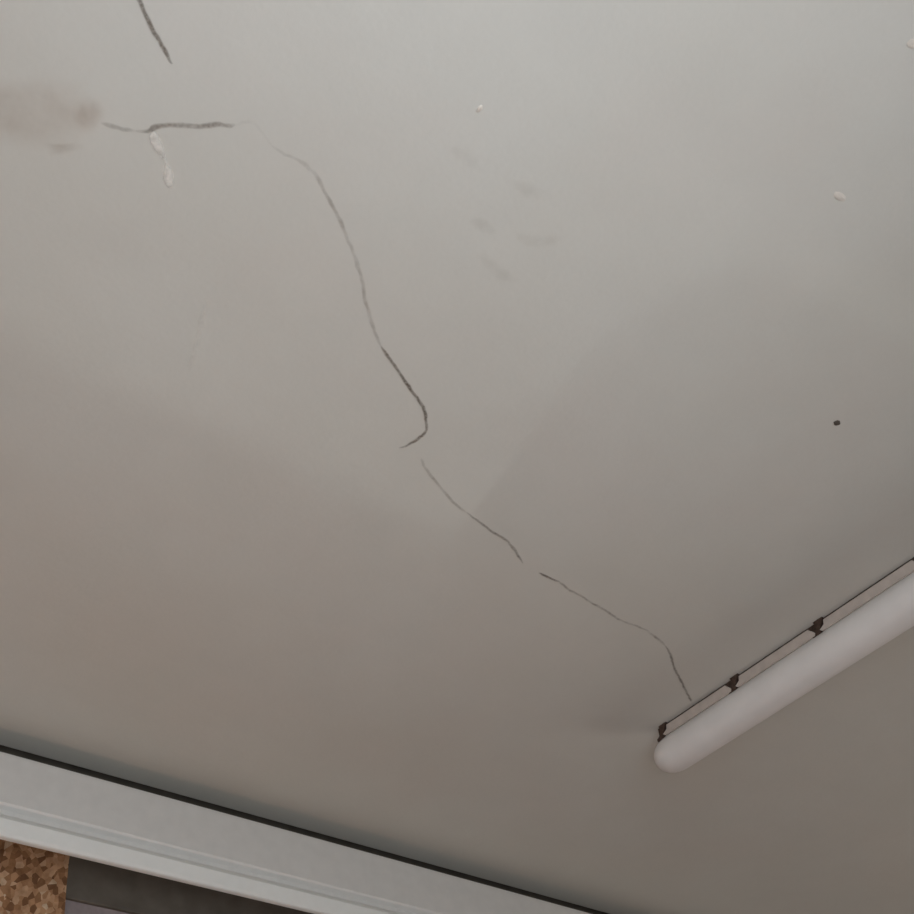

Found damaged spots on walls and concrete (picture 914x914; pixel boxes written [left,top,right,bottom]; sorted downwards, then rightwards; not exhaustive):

crack [141,4,167,56]
crack [149,133,172,185]
crack [384,351,427,444]